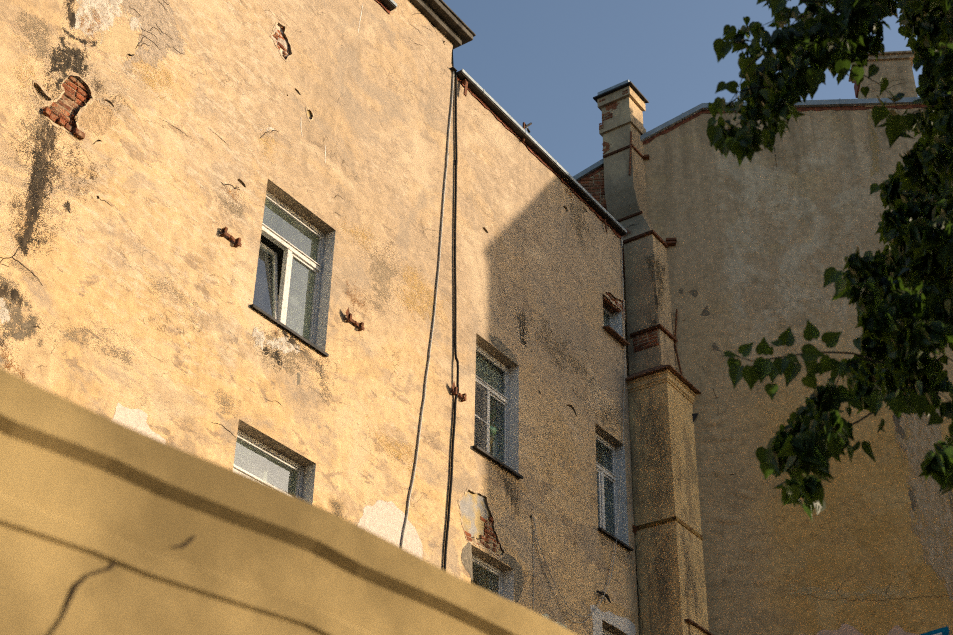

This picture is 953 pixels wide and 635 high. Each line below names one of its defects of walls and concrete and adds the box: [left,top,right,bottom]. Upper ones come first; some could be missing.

leakage [0,0,143,266]
spalling [33,72,118,145]
crack [0,249,43,286]
spalling [458,487,505,559]
crack [787,575,953,603]